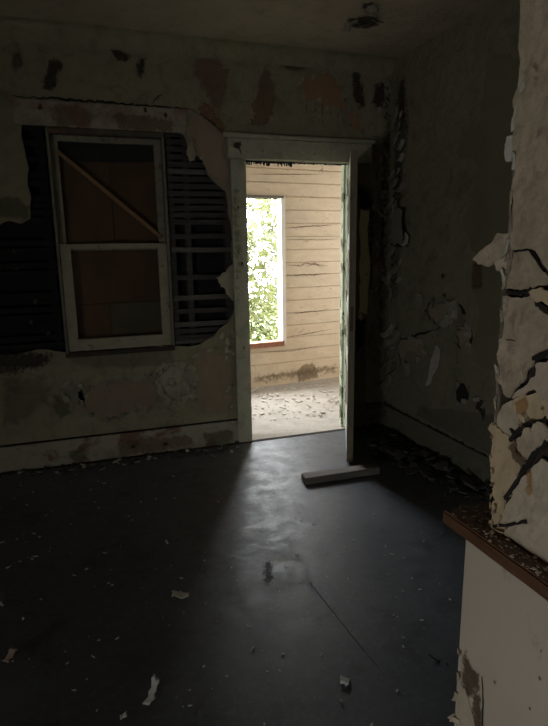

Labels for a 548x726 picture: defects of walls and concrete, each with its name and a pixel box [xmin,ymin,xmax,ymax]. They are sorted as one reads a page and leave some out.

crack [12,94,223,132]
flaking render [162,132,234,346]
flaking render [453,0,548,564]
crack [506,287,548,311]
crack [518,249,546,272]
water stain [259,364,335,383]
crack [514,350,548,393]
crack [503,416,548,501]
crack [490,519,527,527]
peeling [447,672,475,726]